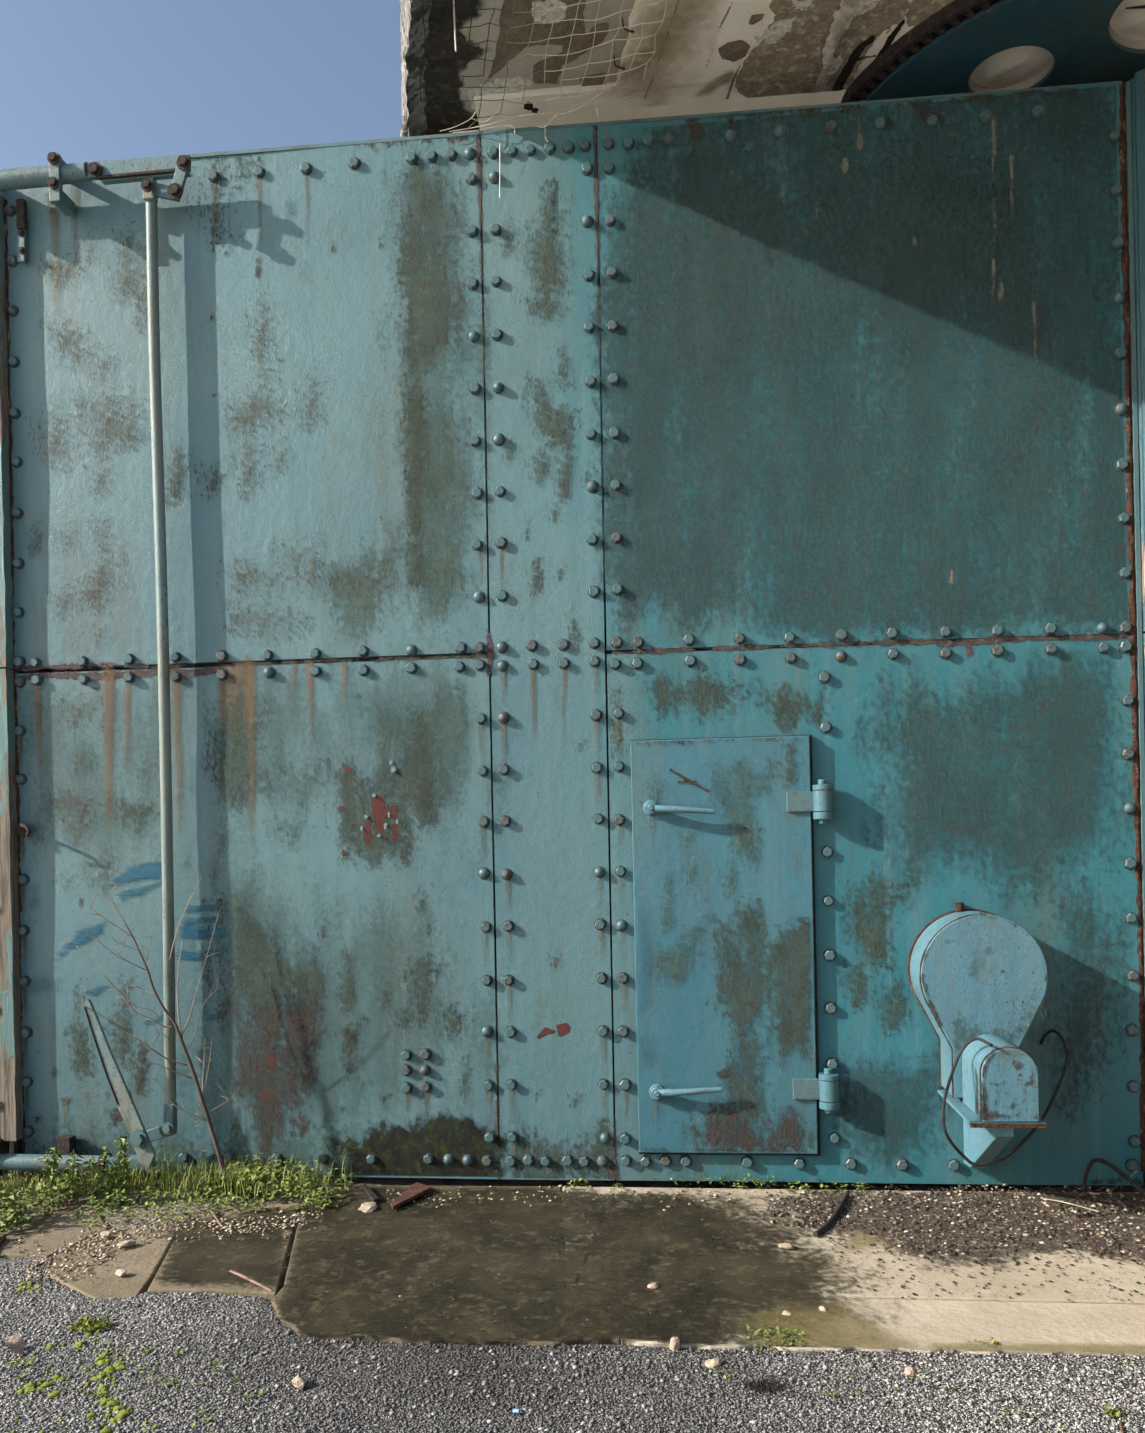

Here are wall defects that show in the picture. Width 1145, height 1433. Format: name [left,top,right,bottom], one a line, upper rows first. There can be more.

crack [1126,3,1145,11]
spalling [686,0,1077,157]
corrosion [35,672,129,777]
corrosion [220,663,254,723]
leakage [30,1119,137,1155]
corrosion [217,988,326,1162]
corrosion [681,1099,815,1152]
leakage [140,1118,902,1345]